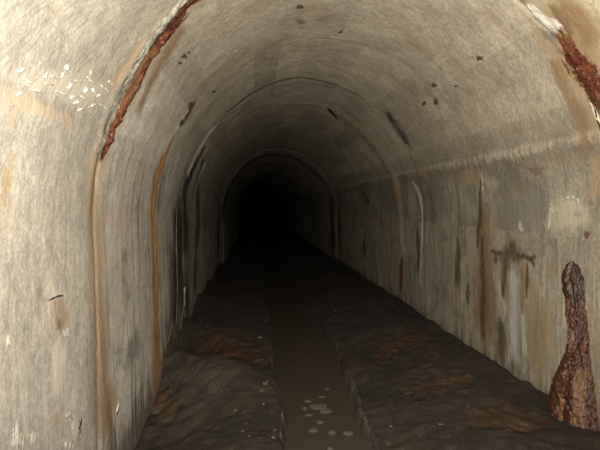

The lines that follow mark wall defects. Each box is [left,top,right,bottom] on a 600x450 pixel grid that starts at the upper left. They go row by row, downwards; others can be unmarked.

corrosion [512,0,600,152]
corrosion [78,0,213,450]
damp [491,178,560,369]